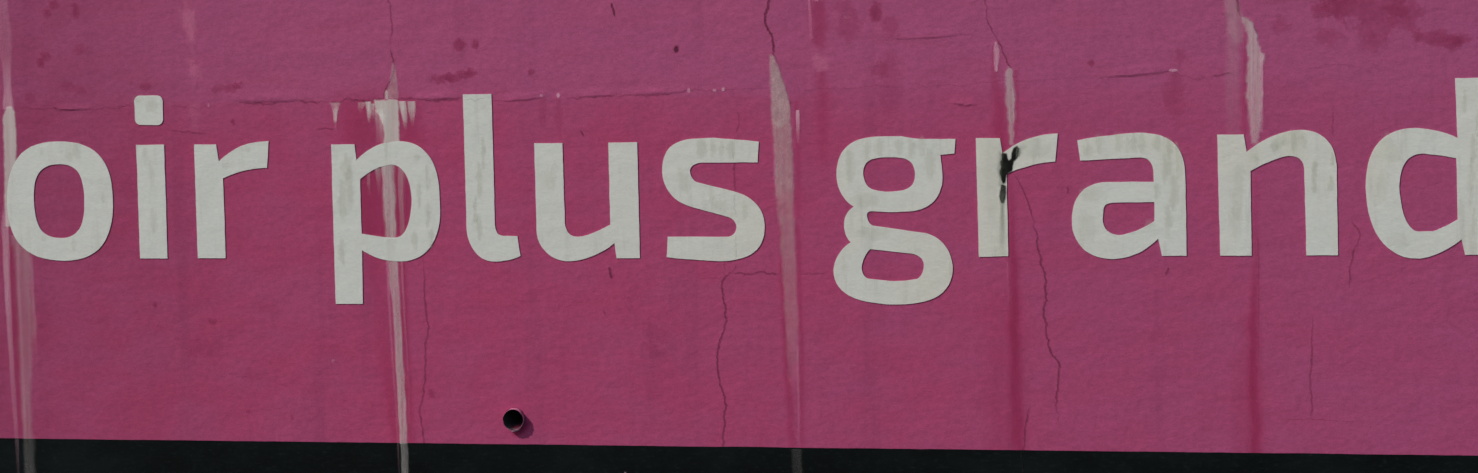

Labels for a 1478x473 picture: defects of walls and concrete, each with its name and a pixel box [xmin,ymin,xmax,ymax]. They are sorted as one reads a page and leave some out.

crack [764,0,775,52]
efflorescence [367,100,404,143]
crack [717,279,727,445]